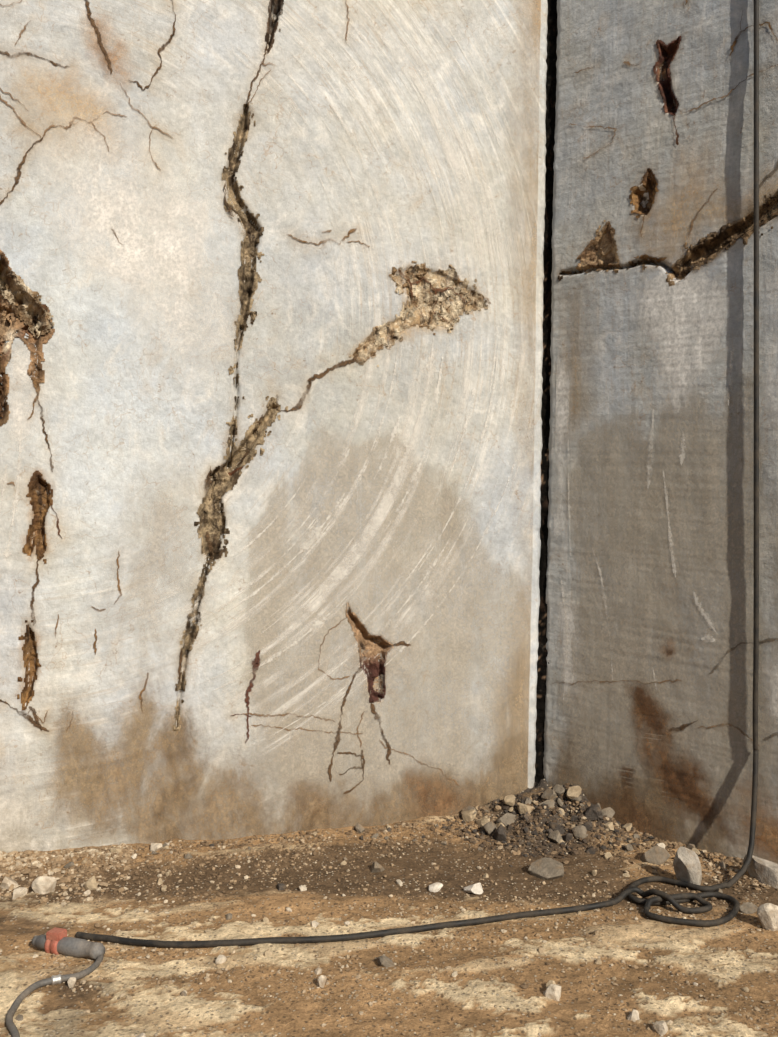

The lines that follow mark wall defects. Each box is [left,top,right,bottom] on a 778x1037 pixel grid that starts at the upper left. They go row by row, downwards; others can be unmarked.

crack [0,0,176,205]
peeling [73,164,204,340]
crack [173,0,366,740]
spalling [349,261,491,367]
spalling [629,168,659,237]
spalling [0,250,62,731]
crack [91,552,122,654]
water stain [208,357,530,805]
crack [0,699,71,731]
crack [139,672,149,713]
rust [633,687,729,834]